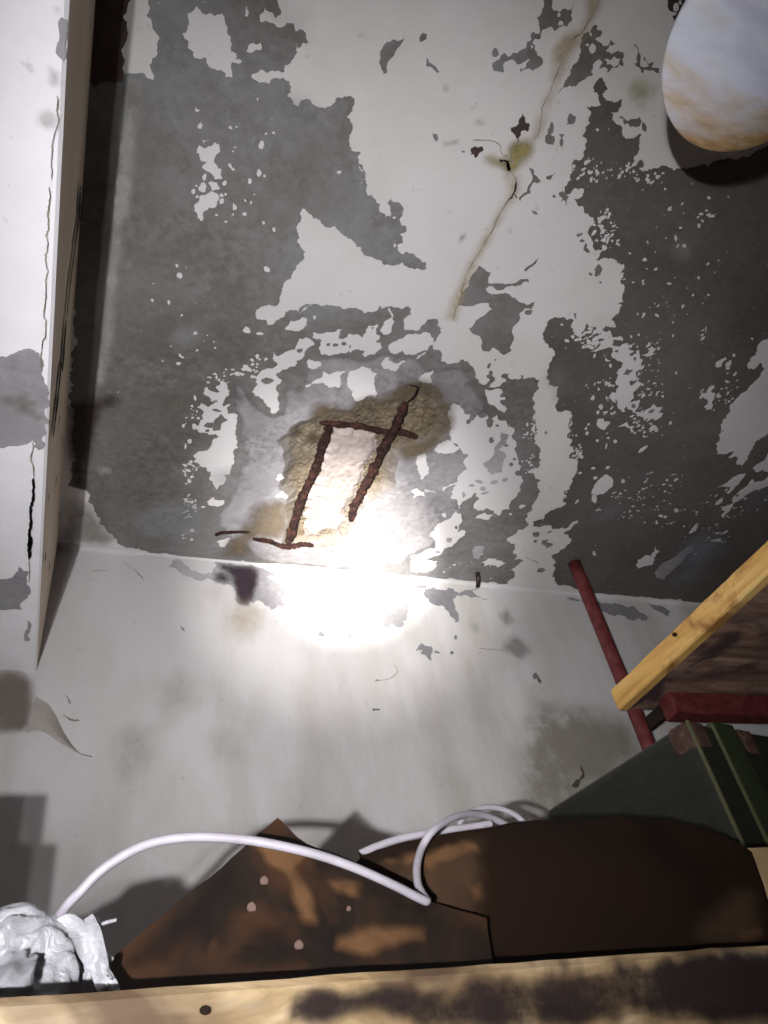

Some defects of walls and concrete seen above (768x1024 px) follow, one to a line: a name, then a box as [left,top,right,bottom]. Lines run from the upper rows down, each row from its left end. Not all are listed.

crack [534,0,595,140]
crack [453,140,517,321]
peeling [0,348,50,450]
crack [27,97,83,580]
peeling [68,0,768,661]
peeling [0,567,32,641]